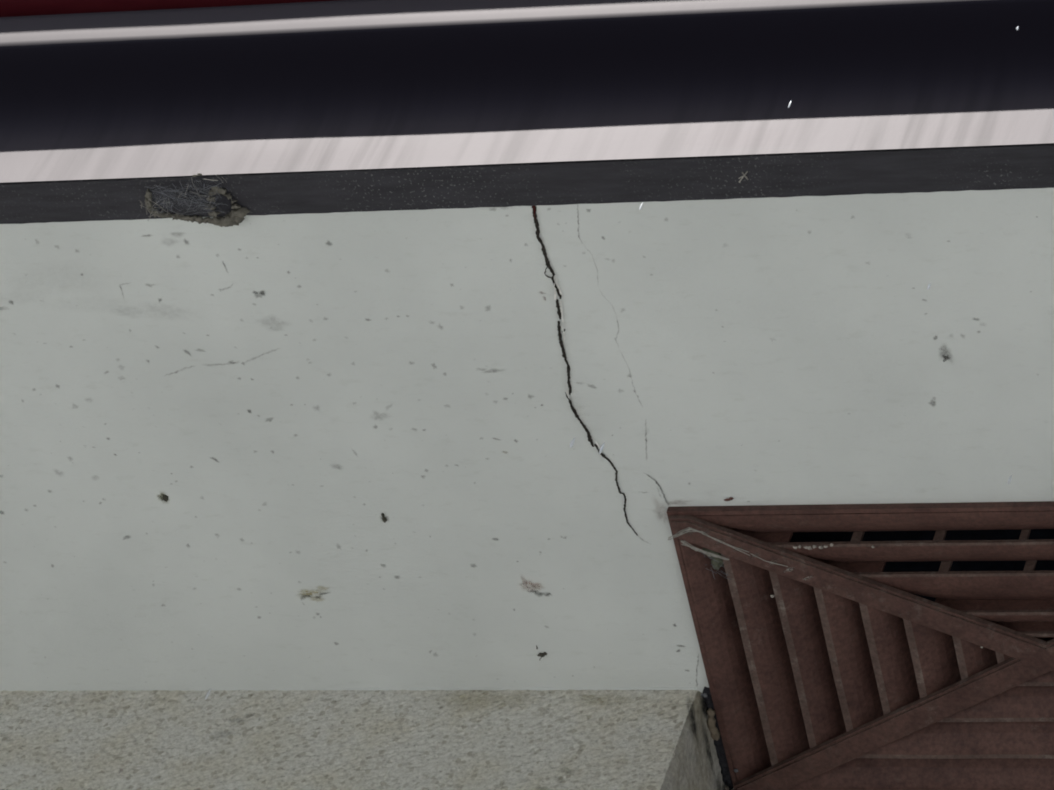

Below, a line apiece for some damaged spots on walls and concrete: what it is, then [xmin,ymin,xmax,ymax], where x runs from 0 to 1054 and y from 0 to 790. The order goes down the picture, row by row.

crack [531,206,638,536]